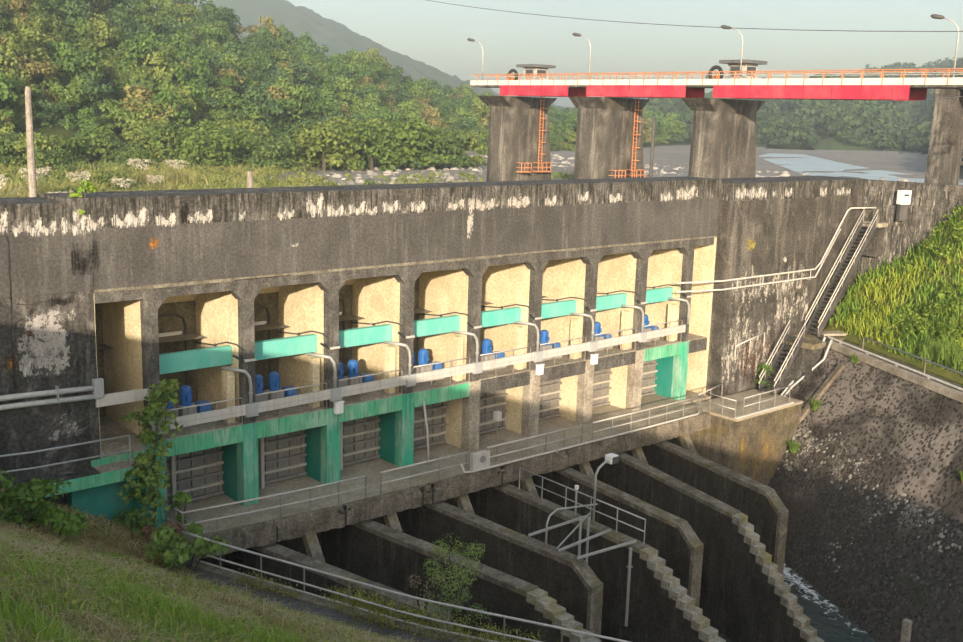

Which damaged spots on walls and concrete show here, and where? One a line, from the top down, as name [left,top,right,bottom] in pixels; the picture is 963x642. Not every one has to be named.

water stain [71,245,100,275]
crack [0,230,46,390]
spalling [16,308,74,377]